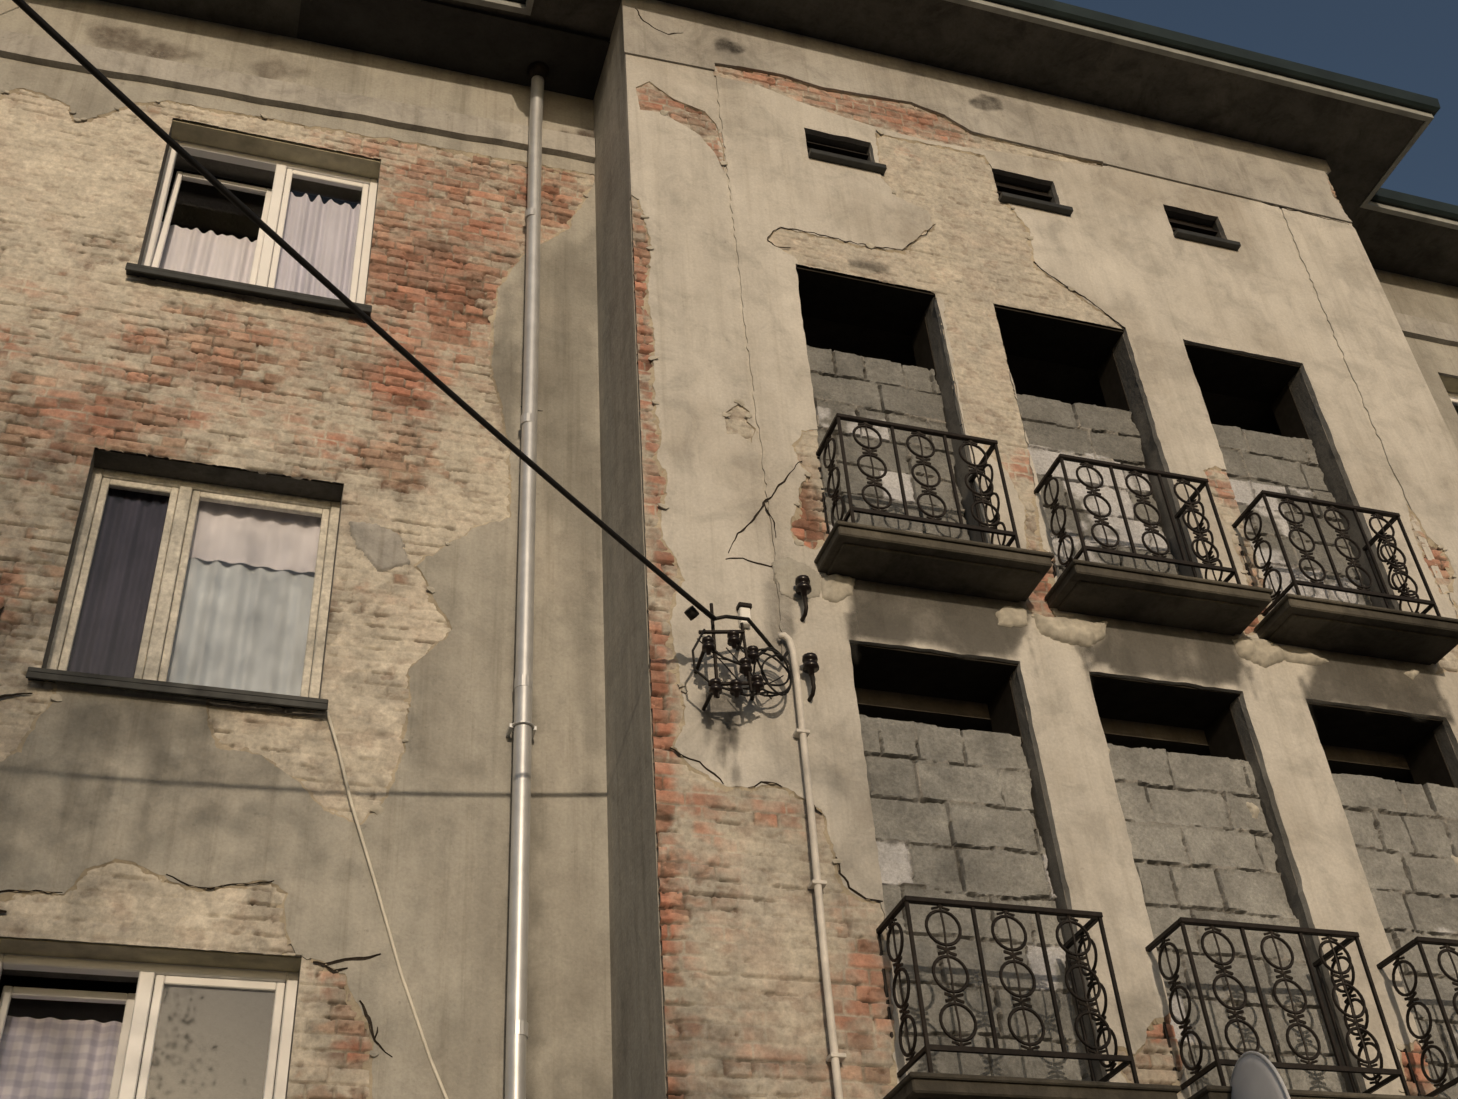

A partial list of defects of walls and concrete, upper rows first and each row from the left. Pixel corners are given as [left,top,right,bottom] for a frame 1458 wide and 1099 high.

flaking render [636,82,728,172]
flaking render [713,65,1125,618]
flaking render [0,88,595,825]
crack [726,461,802,567]
flaking render [1203,466,1263,588]
flaking render [1406,504,1458,619]
flaking render [631,196,897,1099]
flaking render [1241,606,1268,637]
flaking render [1435,645,1458,675]
flaking render [0,859,379,1099]
crack [313,953,393,1057]
flaking render [1396,1040,1438,1097]